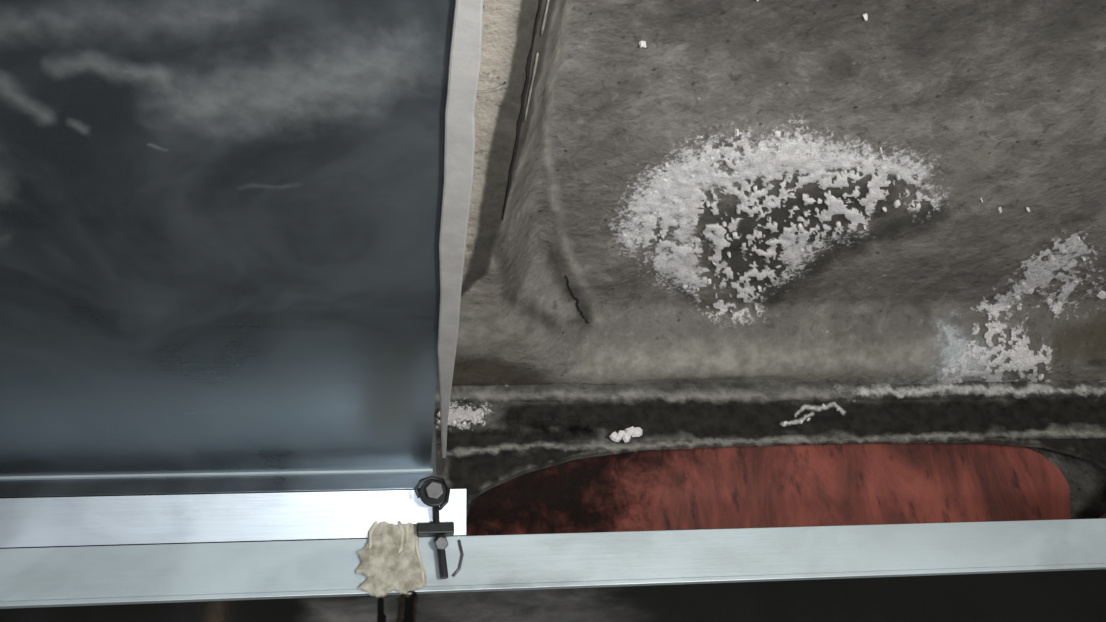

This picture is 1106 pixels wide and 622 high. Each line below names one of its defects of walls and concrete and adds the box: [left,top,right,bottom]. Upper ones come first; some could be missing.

damp [461,0,570,294]
crack [565,275,589,324]
damp [435,230,1106,513]
damp [609,119,948,325]